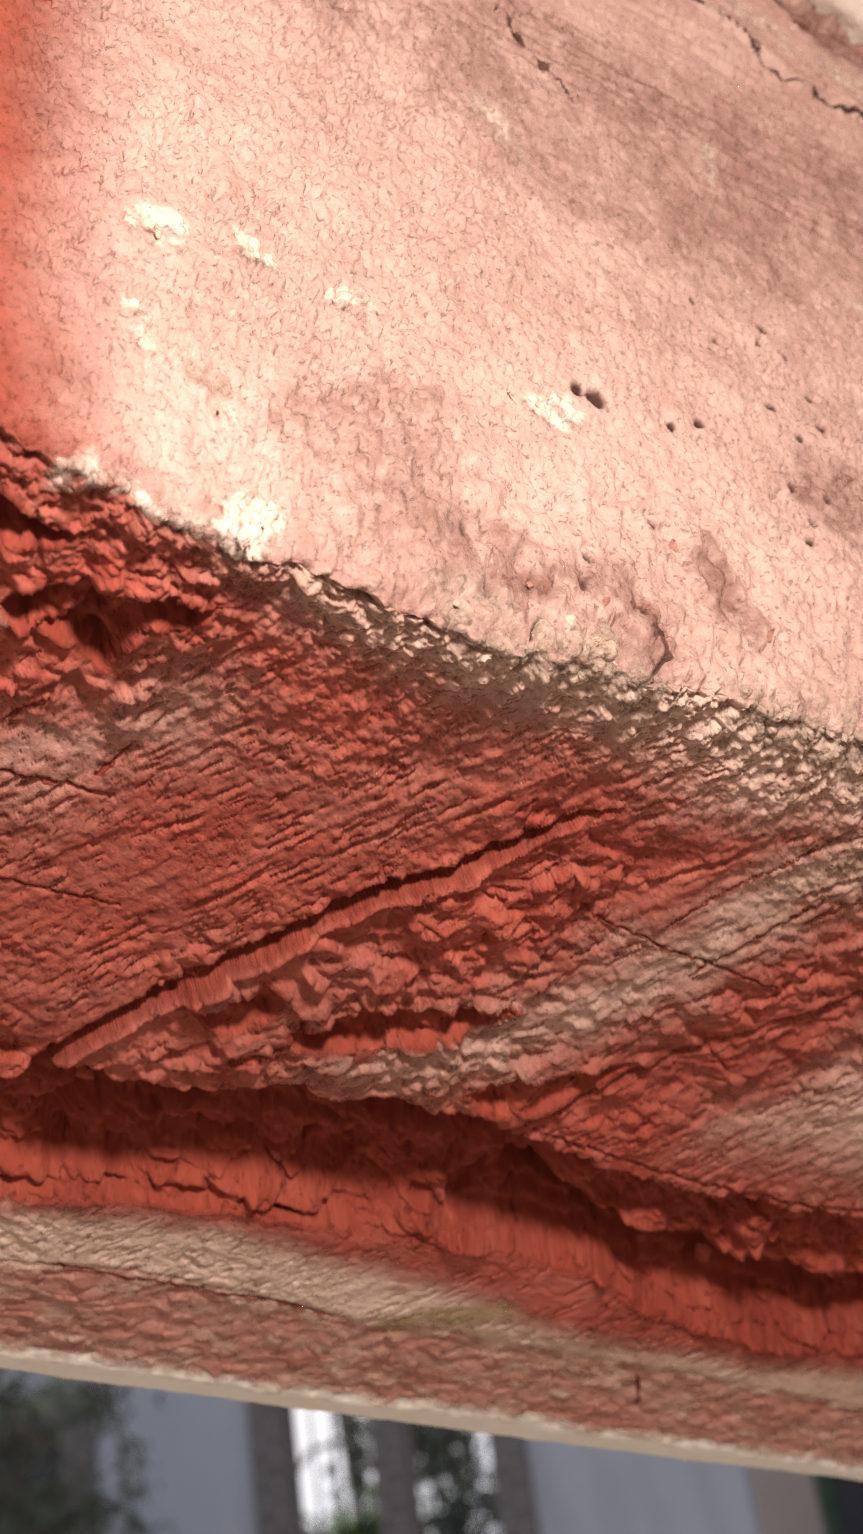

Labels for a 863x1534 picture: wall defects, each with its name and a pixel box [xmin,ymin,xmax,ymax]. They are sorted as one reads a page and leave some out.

crack [494,0,573,102]
crack [696,0,863,118]
spalling [0,482,90,553]
peeling [211,489,285,561]
spalling [0,577,226,678]
crack [1,693,55,720]
crack [0,744,132,795]
crack [567,838,835,996]
spalling [287,1005,522,1063]
spalling [0,1039,863,1358]
crack [38,1261,331,1316]
peeling [0,1267,863,1467]